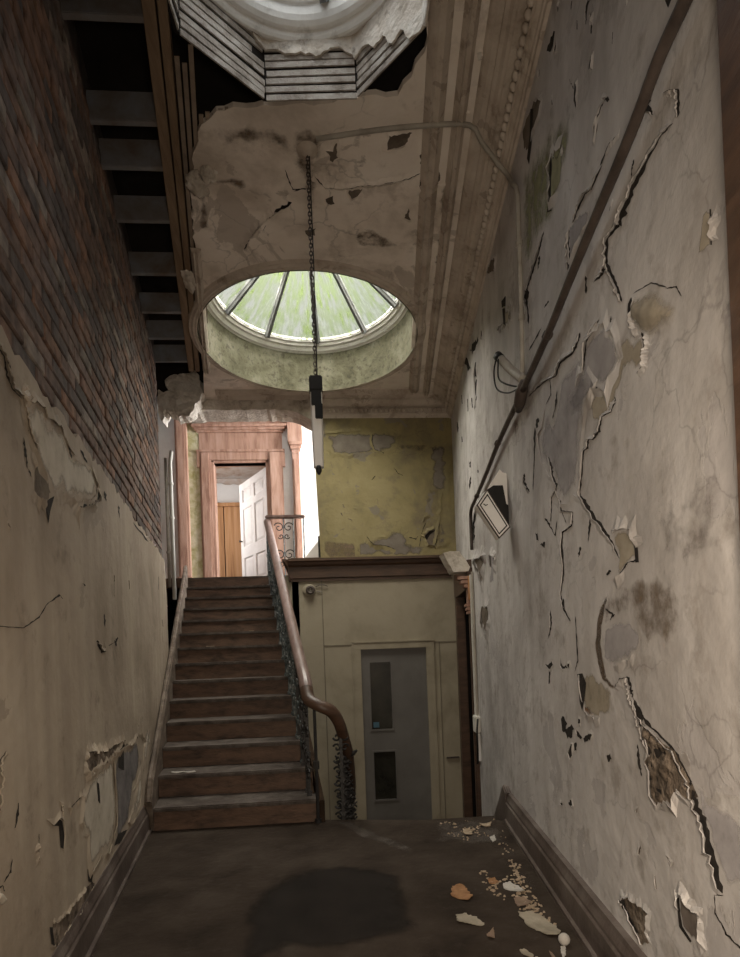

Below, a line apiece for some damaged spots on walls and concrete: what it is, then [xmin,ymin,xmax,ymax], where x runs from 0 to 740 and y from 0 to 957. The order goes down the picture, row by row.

peeling [381,131,411,154]
peeling [461,331,483,411]
peeling [572,307,642,422]
peeling [21,381,99,524]
peeling [609,514,643,590]
peeling [545,659,610,762]
peeling [46,732,150,950]
crack [615,676,740,948]
spalling [641,725,740,881]
damp [245,867,409,957]
peeling [617,889,652,951]
peeling [674,881,707,957]